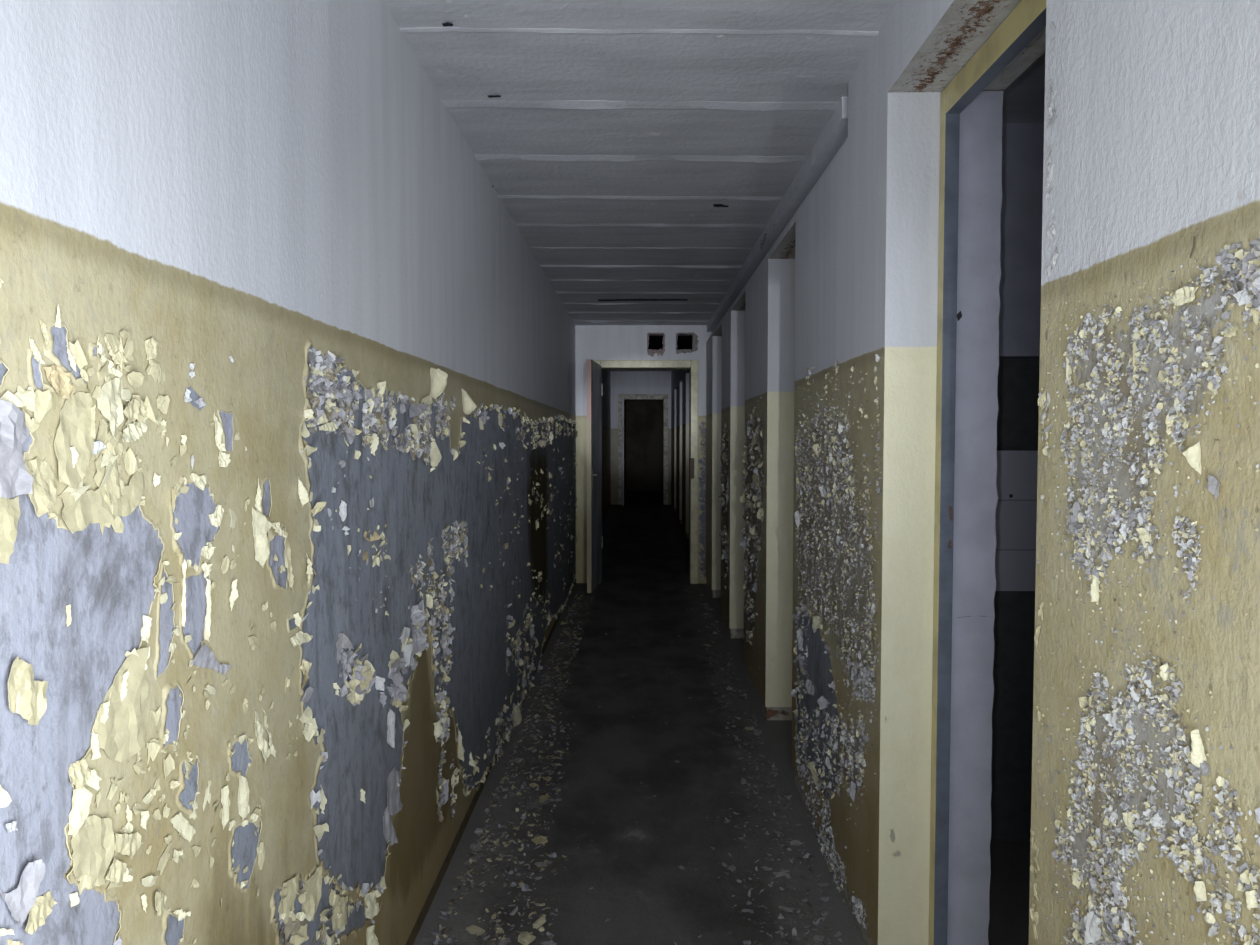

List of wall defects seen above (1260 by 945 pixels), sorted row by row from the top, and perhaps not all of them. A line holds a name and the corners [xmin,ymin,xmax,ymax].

peeling [0,304,234,945]
peeling [229,579,239,610]
peeling [221,707,277,893]
peeling [252,339,578,945]
peeling [791,605,844,802]